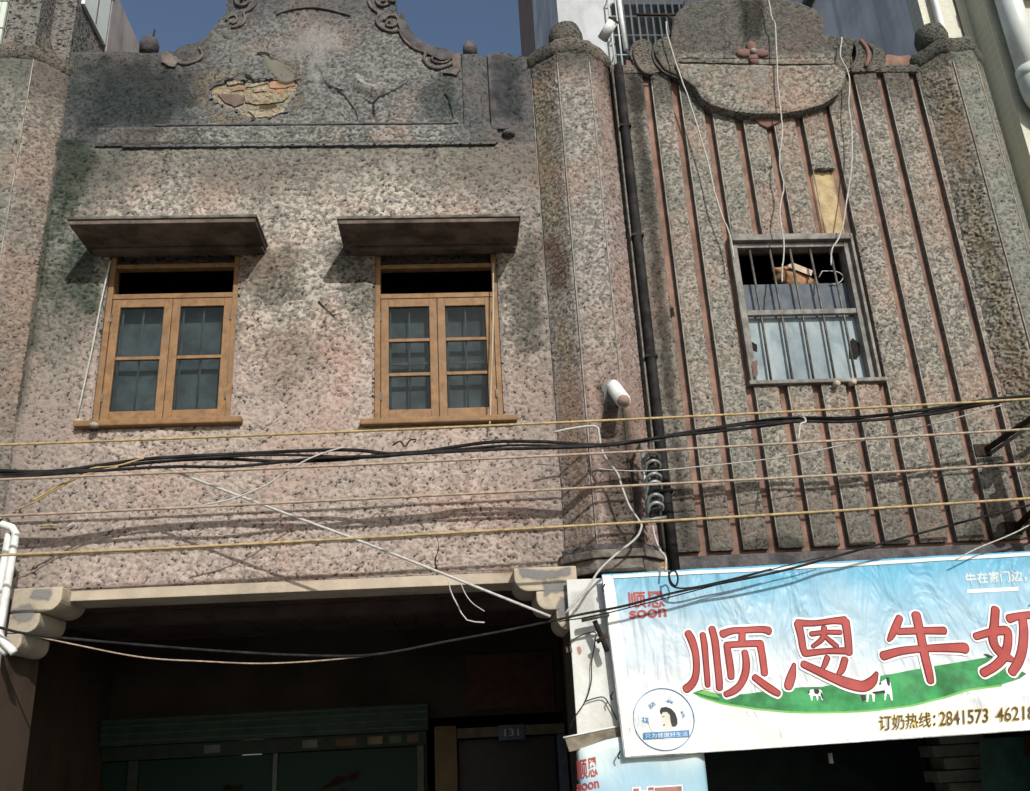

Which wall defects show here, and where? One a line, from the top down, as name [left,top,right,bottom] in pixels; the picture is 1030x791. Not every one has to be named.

flaking render [194,55,302,124]
crack [304,63,407,118]